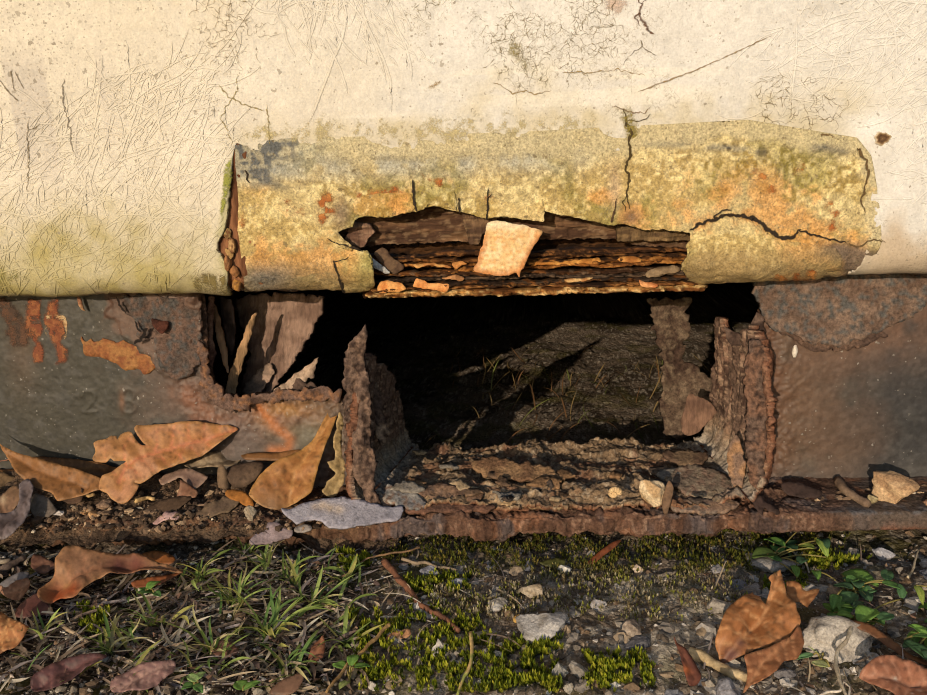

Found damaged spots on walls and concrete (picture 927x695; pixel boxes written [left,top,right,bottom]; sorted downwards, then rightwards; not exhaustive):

damp [416,119,474,142]
crack [470,0,770,222]
crack [756,69,870,213]
peeling [488,198,545,222]
crack [690,209,885,247]
peeling [323,232,449,293]
rust [0,298,67,364]
rust [342,324,577,516]
rust [646,296,775,517]